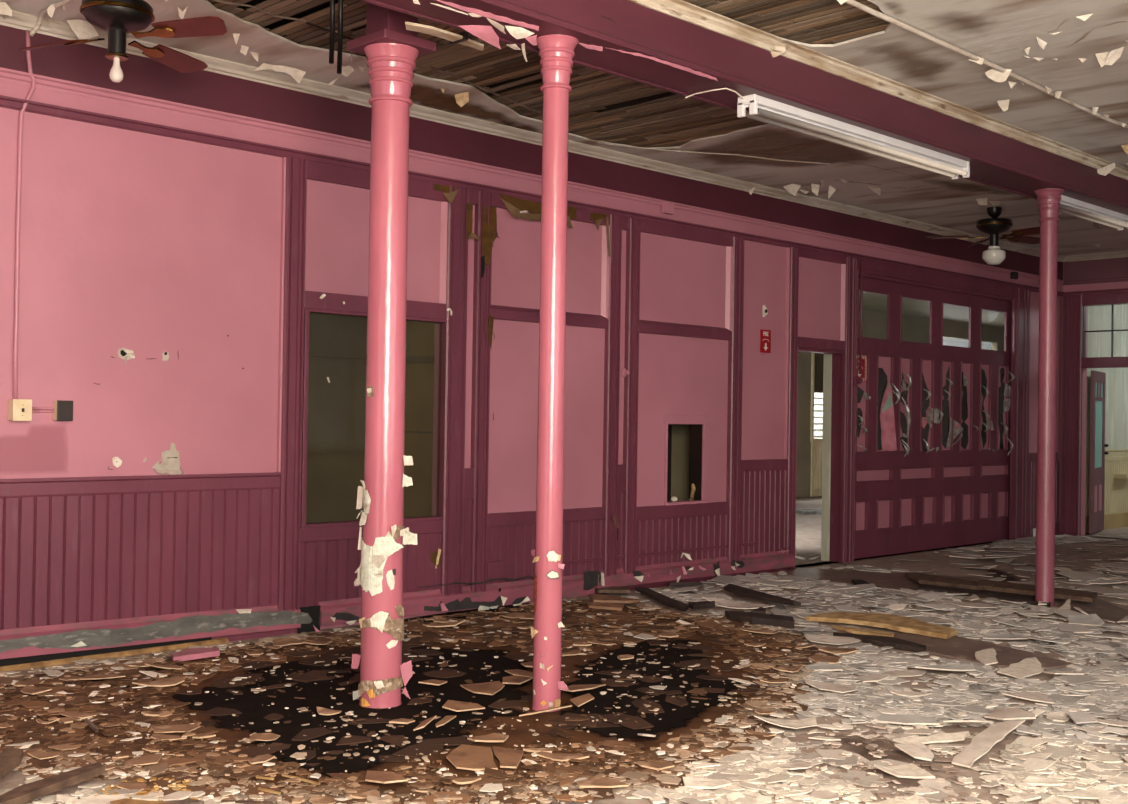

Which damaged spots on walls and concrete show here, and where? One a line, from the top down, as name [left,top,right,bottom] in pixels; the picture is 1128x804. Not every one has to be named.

peeling [233,33,306,83]
peeling [413,0,539,62]
peeling [579,43,718,81]
peeling [969,56,1024,112]
crack [1050,18,1128,48]
peeling [434,184,541,278]
peeling [402,455,413,487]
peeling [354,480,417,596]
peeling [531,550,565,580]
peeling [0,609,321,653]
damp [72,601,819,796]
damp [0,715,128,740]